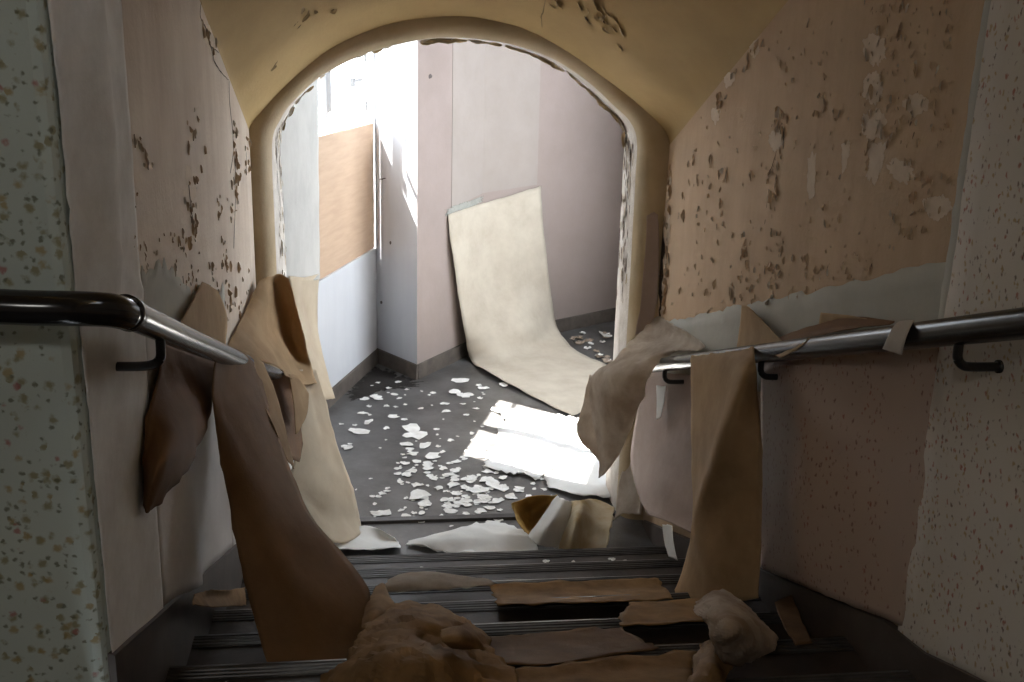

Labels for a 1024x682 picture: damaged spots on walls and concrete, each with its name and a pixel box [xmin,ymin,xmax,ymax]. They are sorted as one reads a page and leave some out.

peeling [134,107,250,322]
peeling [418,38,634,303]
peeling [661,0,991,357]